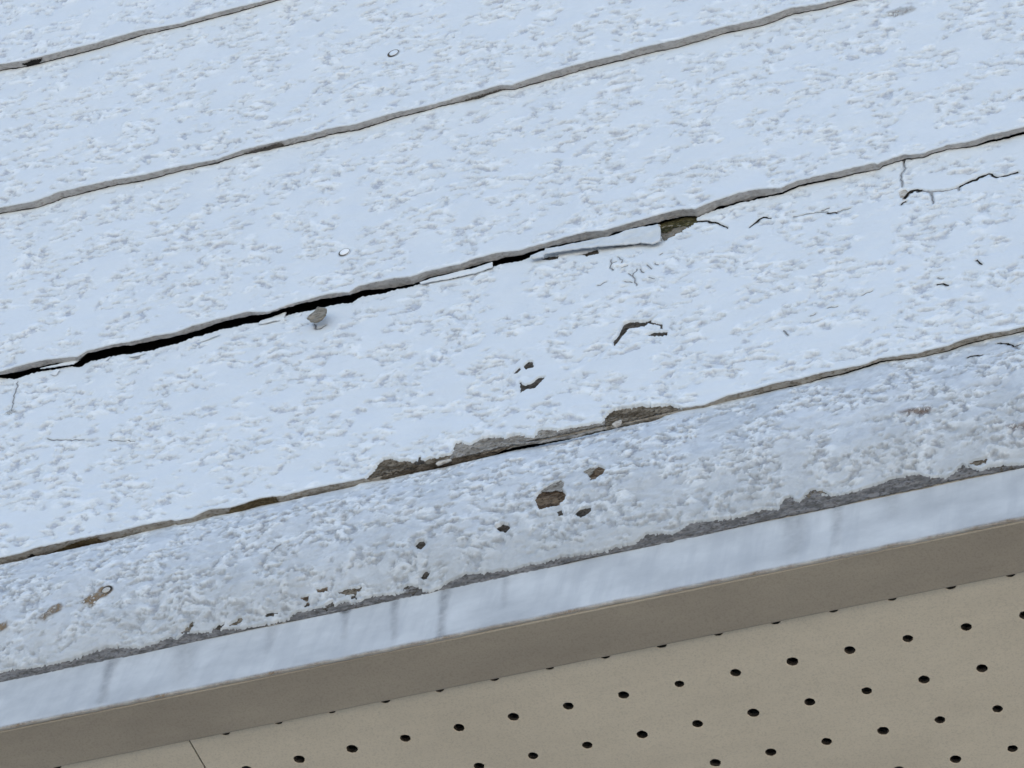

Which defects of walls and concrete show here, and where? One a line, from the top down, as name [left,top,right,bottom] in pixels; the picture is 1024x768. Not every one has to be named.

crack [899,160,1018,205]
crack [597,243,663,286]
crack [613,320,668,346]
peeling [367,405,680,480]
peeling [535,480,566,516]
spalling [301,587,362,612]